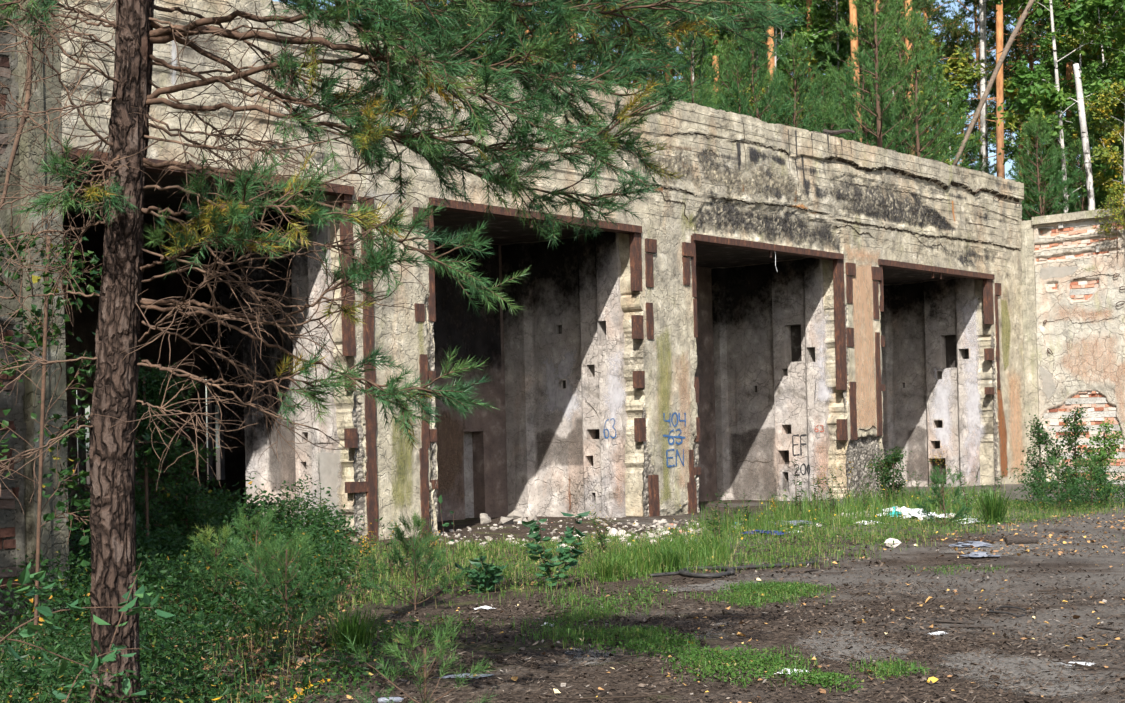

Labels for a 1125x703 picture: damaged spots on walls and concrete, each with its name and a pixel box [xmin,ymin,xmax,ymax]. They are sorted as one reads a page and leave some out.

flaking render [0,17,19,175]
crack [633,119,789,168]
crack [619,156,1023,274]
water stain [857,192,955,230]
flaking render [1034,215,1125,266]
flaking render [1044,276,1101,304]
flaking render [0,317,26,616]
flaking render [1040,389,1125,484]